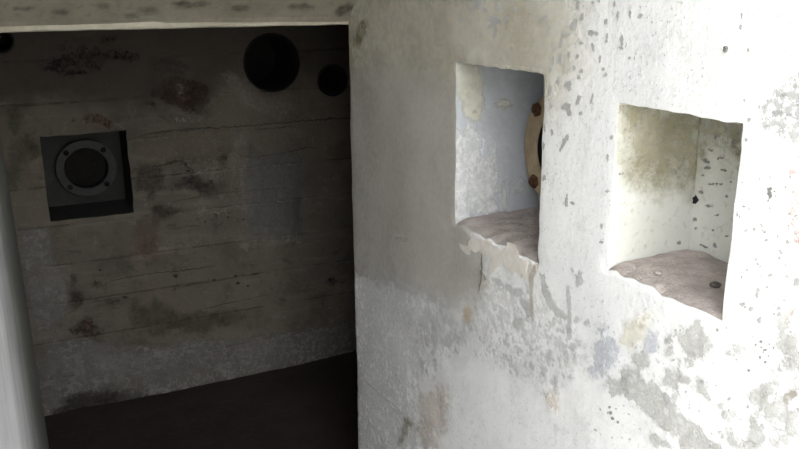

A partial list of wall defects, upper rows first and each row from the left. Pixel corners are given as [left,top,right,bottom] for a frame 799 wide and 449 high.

peeling [349,0,799,449]
damp [619,105,743,179]